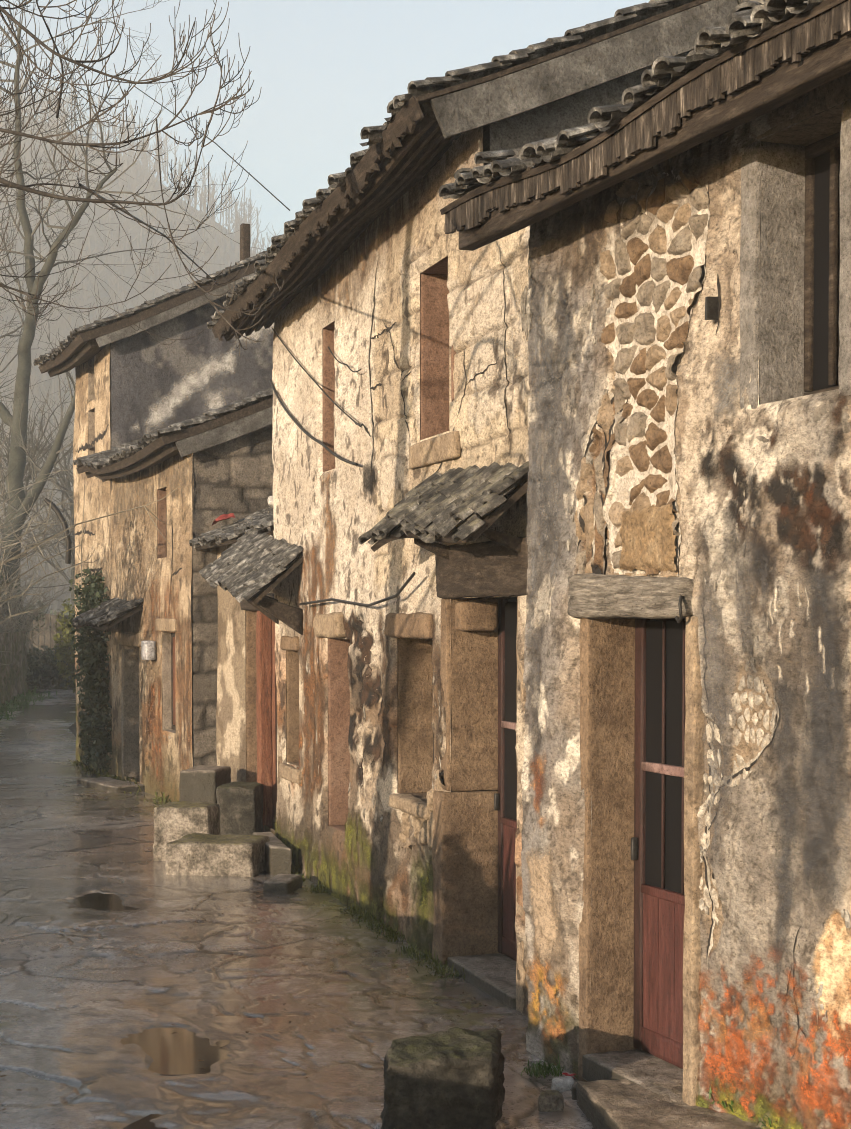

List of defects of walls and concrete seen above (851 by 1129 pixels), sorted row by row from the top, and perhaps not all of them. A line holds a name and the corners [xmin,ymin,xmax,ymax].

crack [354,256,411,464]
crack [453,247,510,452]
peeling [520,259,533,341]
spalling [567,168,710,577]
leakage [832,393,846,454]
crack [701,604,780,972]
leakage [700,425,851,963]
corrosion [530,955,564,1050]
corrosion [699,973,851,1129]
spalling [806,909,851,1065]